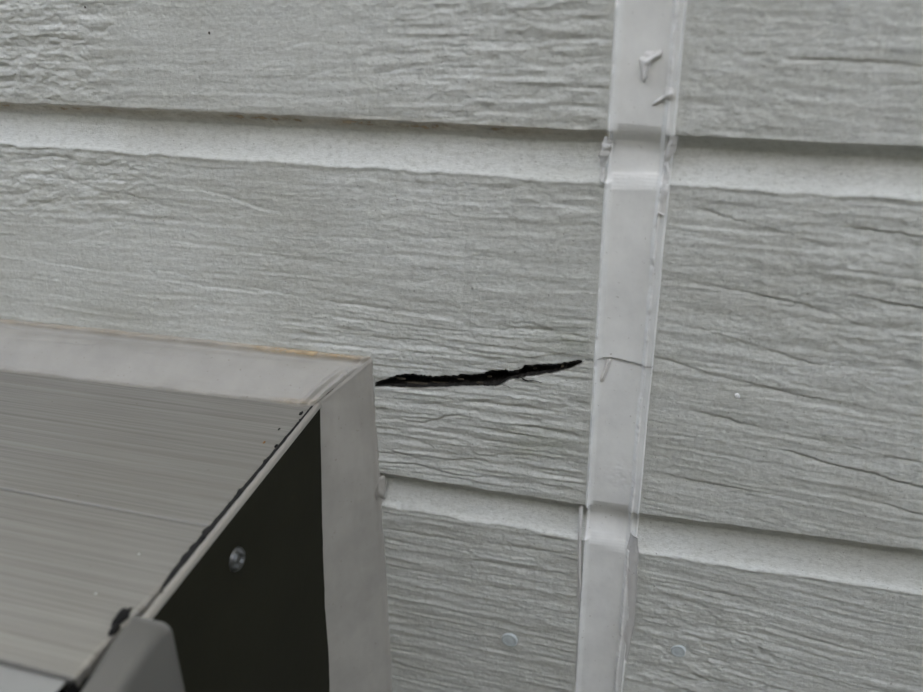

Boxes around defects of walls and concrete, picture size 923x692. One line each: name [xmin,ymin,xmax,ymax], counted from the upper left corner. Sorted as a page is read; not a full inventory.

crack [375,358,653,388]